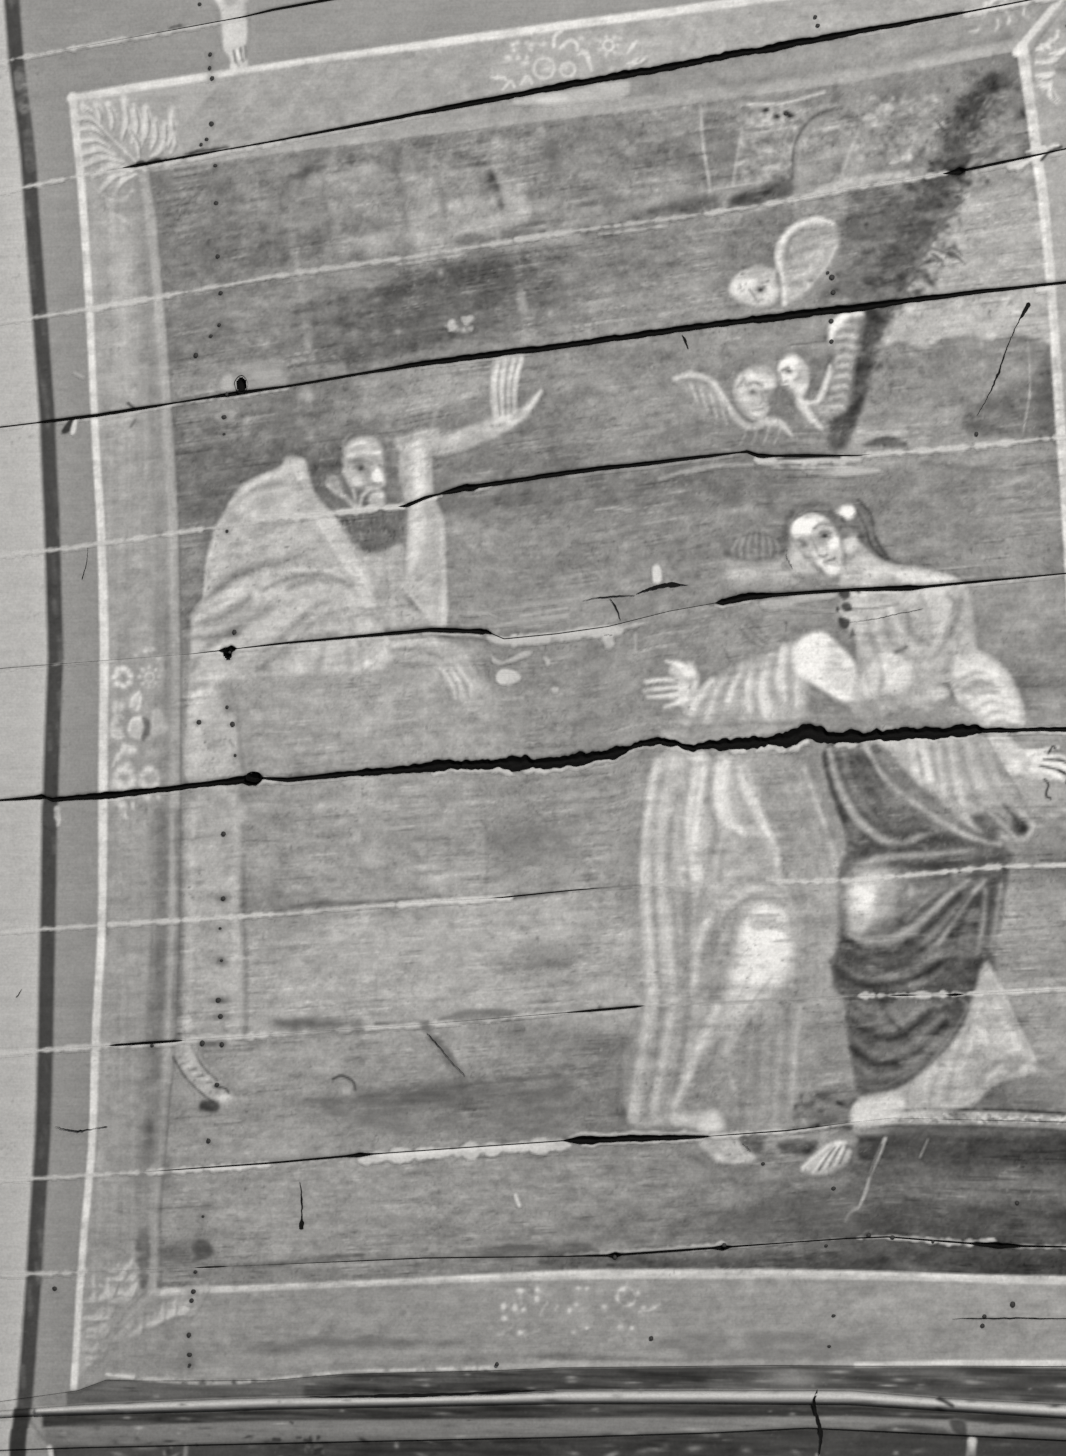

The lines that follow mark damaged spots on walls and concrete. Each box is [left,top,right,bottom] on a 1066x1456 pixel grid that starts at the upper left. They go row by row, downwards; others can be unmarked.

crack [0,0,1066,196]
crack [0,141,1066,326]
crack [0,281,1066,579]
crack [0,573,1066,672]
crack [0,723,1066,803]
crack [0,1118,1066,1280]
crack [813,1389,823,1455]